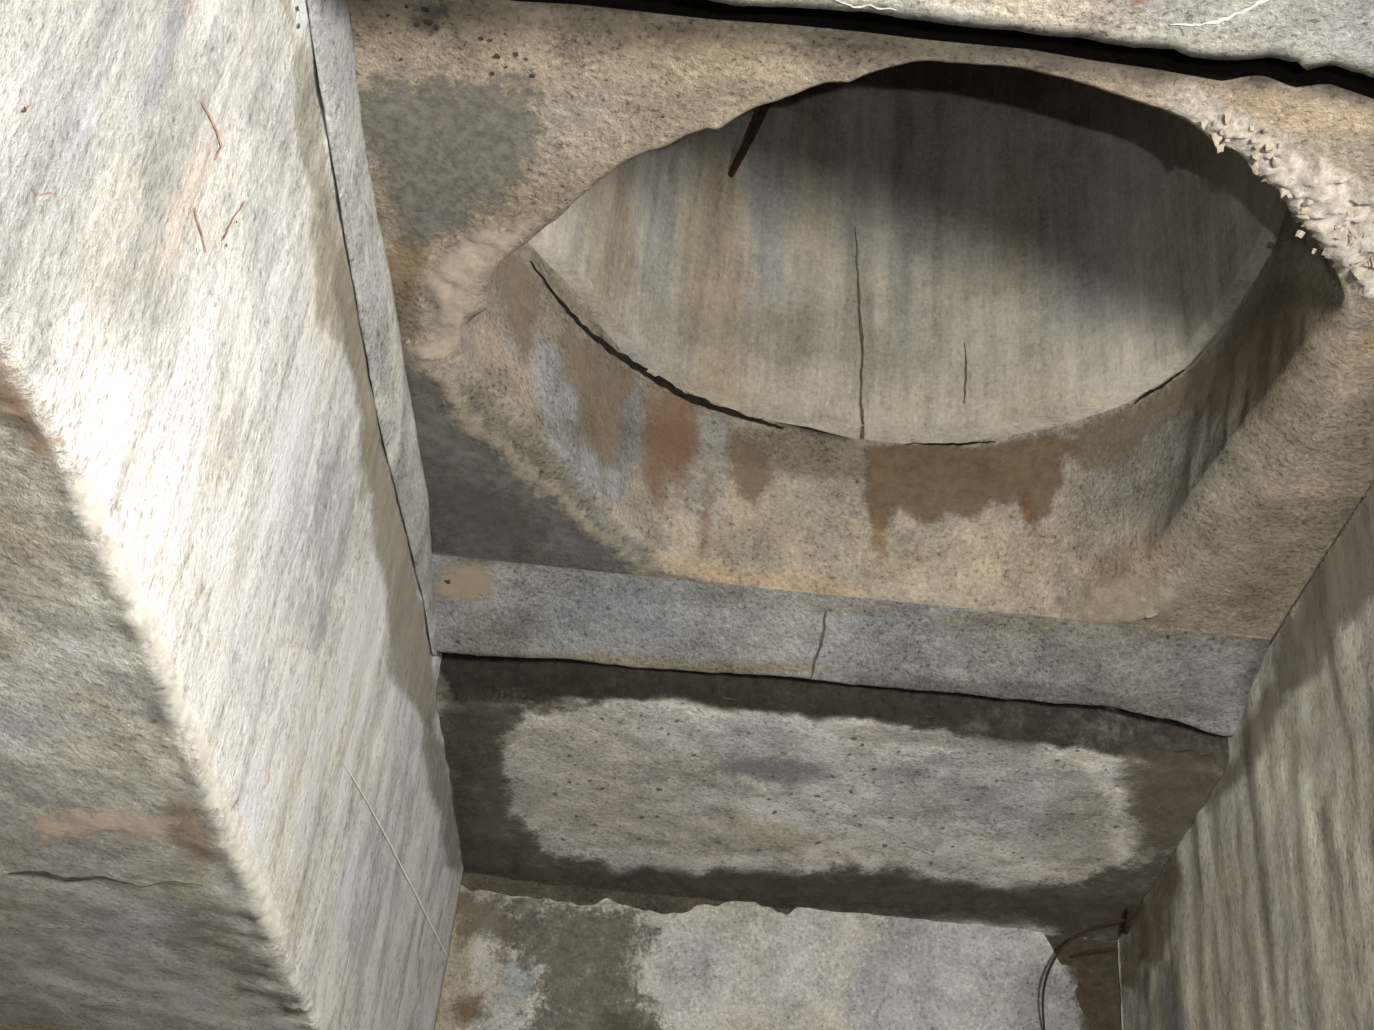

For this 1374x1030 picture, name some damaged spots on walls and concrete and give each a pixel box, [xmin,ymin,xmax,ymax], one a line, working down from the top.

leakage [386,4,450,36]
leakage [360,33,547,246]
spalling [1175,100,1374,300]
crack [810,611,827,679]
leakage [338,254,1374,1030]
crack [8,871,203,888]